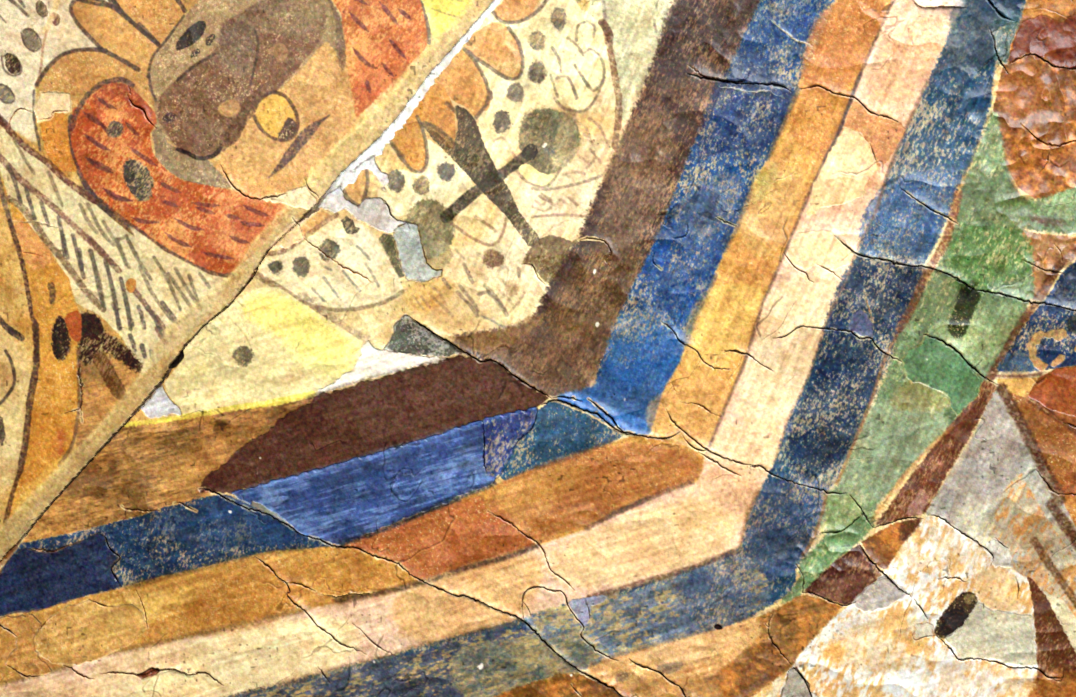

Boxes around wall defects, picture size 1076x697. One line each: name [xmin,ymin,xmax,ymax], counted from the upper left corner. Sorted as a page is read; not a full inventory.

crack [771,19,816,51]
crack [977,0,1076,75]
crack [686,66,900,124]
crack [868,142,878,161]
crack [1020,122,1076,173]
crack [901,188,959,225]
crack [652,228,689,271]
crack [661,236,1076,373]
peeling [200,314,549,580]
crack [120,315,1065,697]
crack [87,532,149,630]
crack [5,663,226,688]